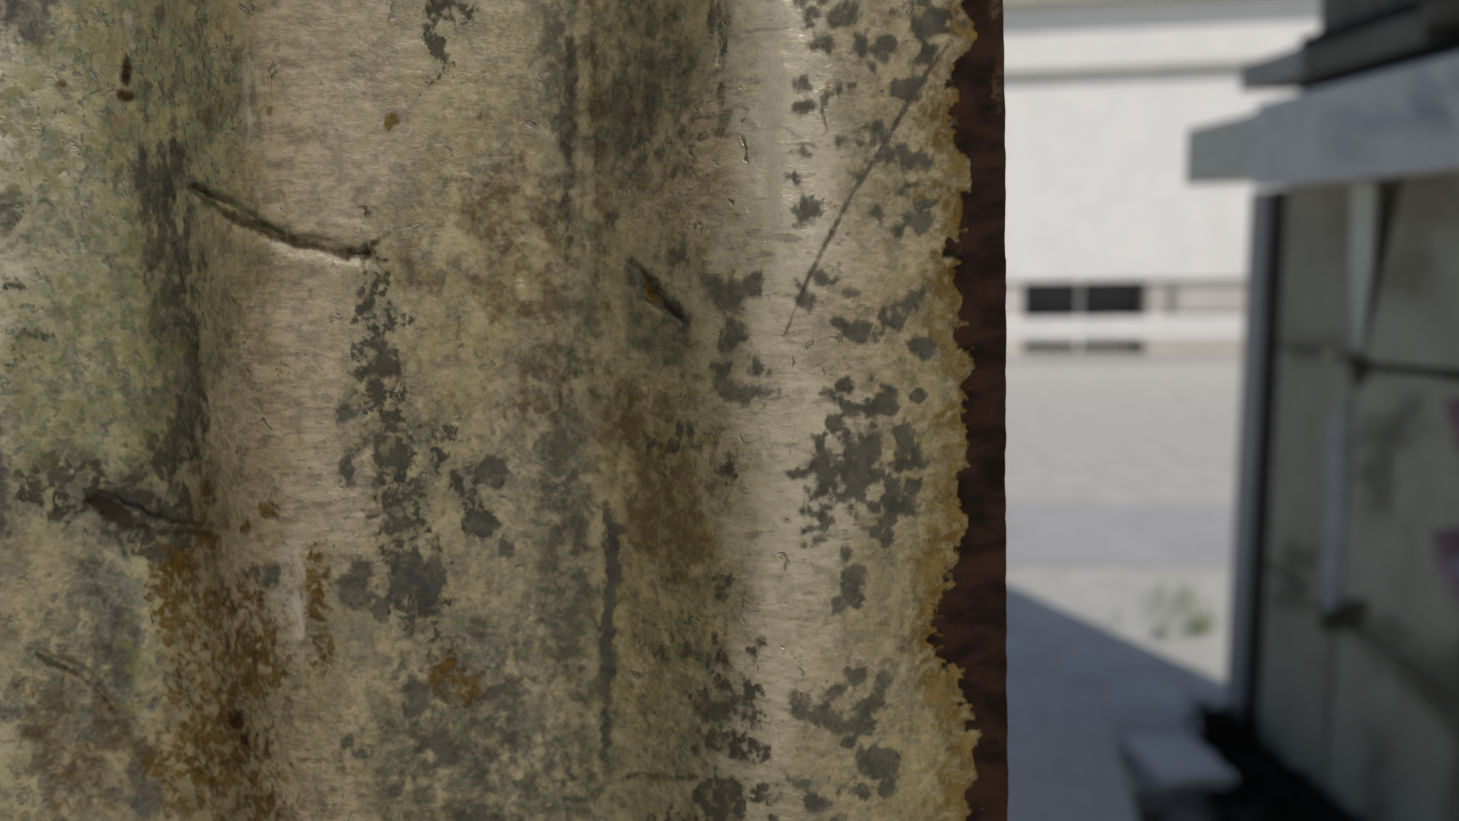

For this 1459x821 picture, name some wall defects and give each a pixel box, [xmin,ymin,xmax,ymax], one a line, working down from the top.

rust [384,112,400,129]
water stain [0,138,213,582]
rust [98,462,295,821]
rust [304,542,335,671]
water stain [350,242,495,639]
water stain [647,673,771,821]
rust [912,0,1008,821]